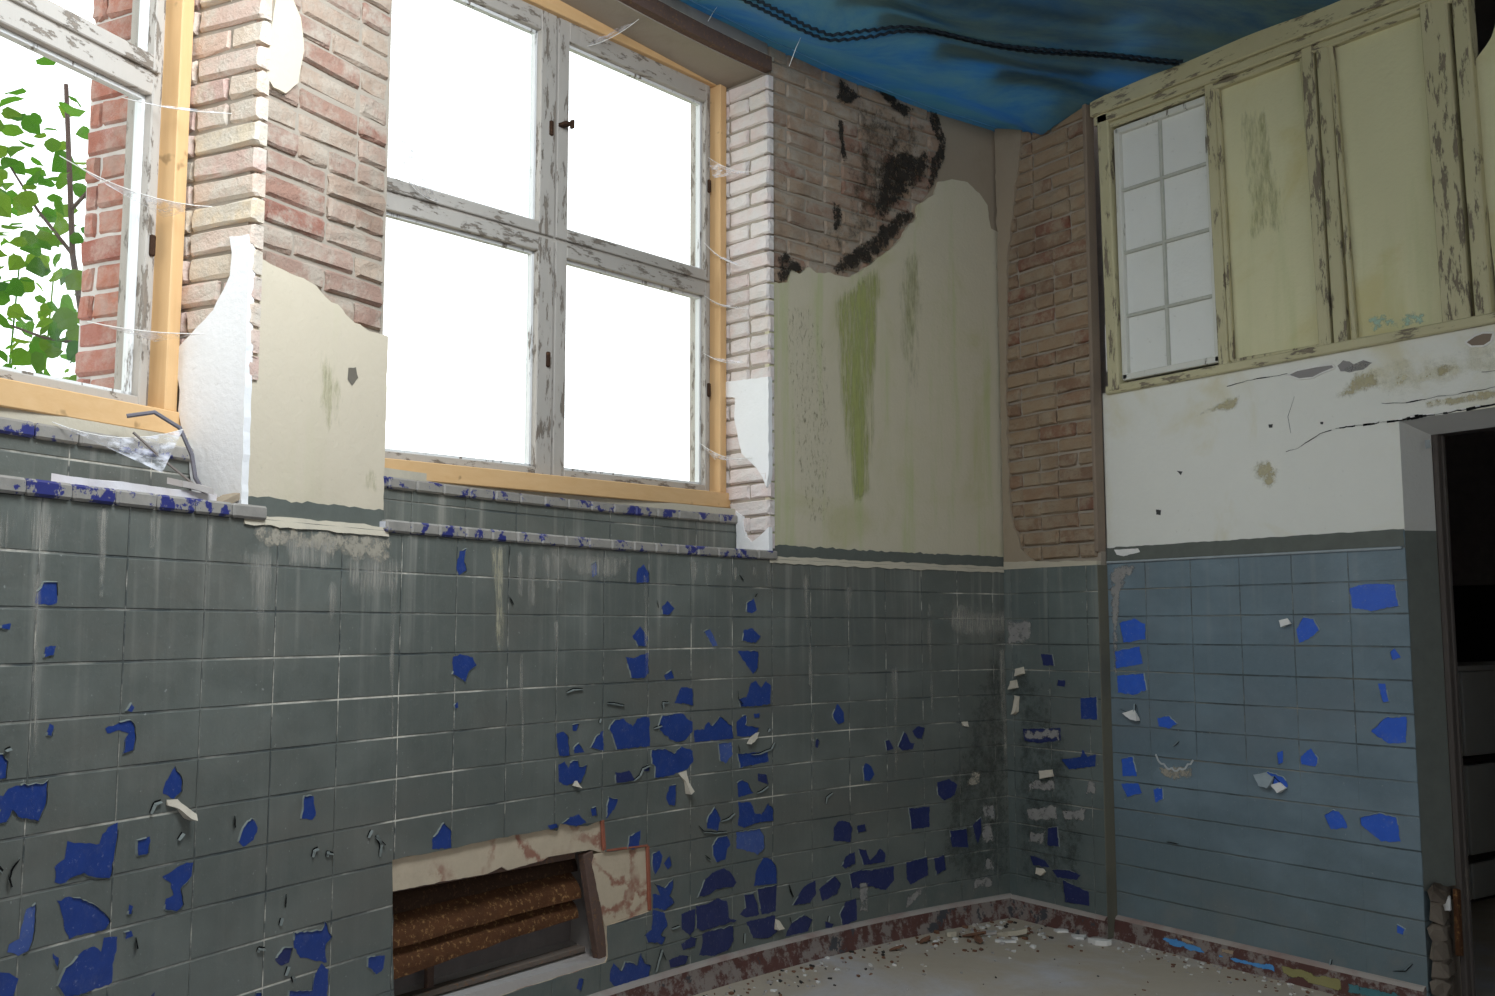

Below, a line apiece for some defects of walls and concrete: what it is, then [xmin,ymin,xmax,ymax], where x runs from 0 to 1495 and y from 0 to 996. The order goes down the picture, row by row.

flaking render [179,0,392,380]
leakage [833,79,946,274]
leakage [777,252,803,282]
flaking render [726,47,944,548]
peeling [1349,583,1400,612]
peeling [1371,684,1407,744]
peeling [0,746,49,824]
peeling [163,766,198,821]
peeling [392,592,982,986]
peeling [1325,809,1400,842]
peeling [52,822,151,996]
peeling [275,921,332,996]